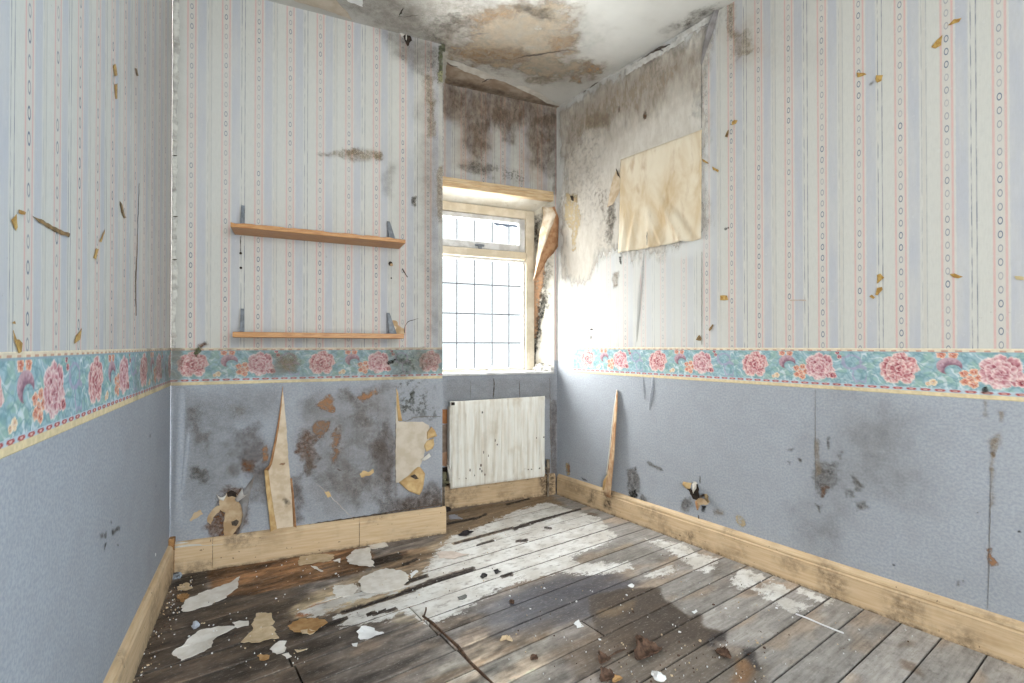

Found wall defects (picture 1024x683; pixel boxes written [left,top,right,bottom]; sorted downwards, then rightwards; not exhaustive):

water stain [437,0,602,84]
water stain [445,85,557,176]
flaking render [560,10,719,284]
spalling [190,476,255,537]
flaking render [268,393,293,529]
water stain [294,428,341,472]
flaking render [396,397,437,495]
spalling [682,480,710,519]